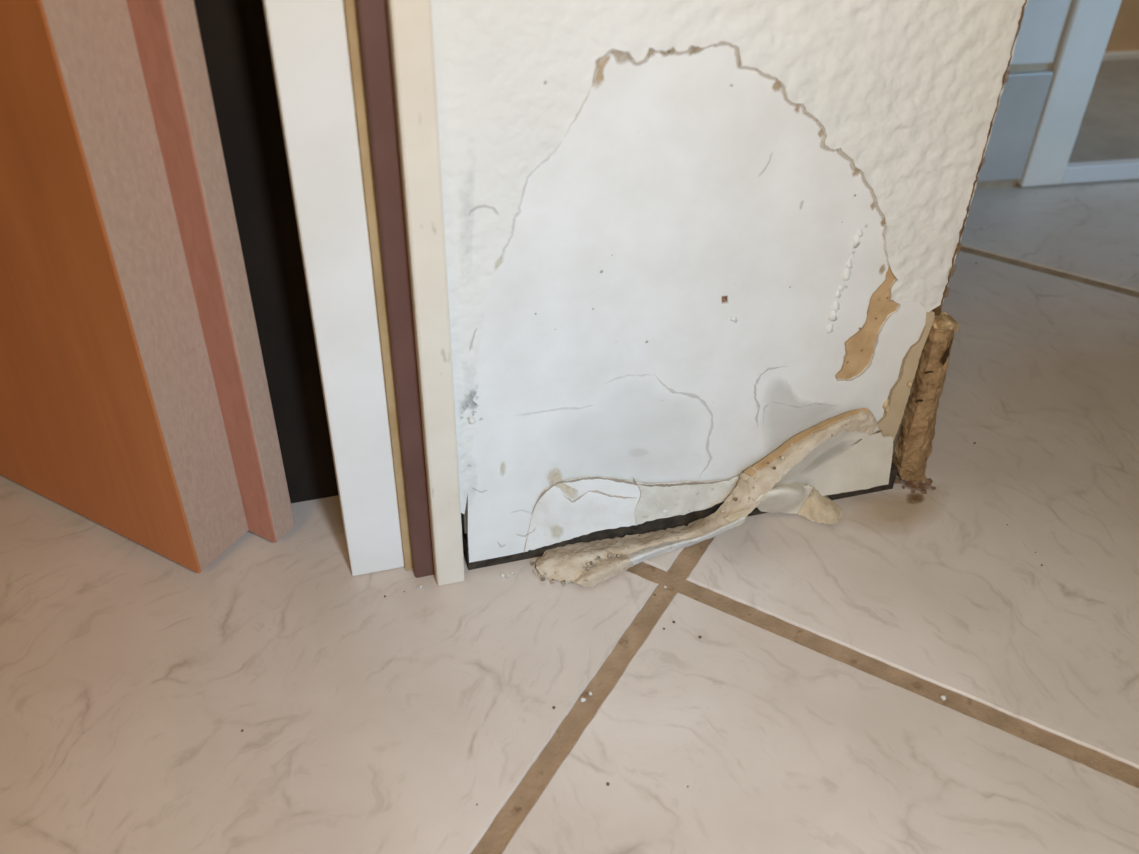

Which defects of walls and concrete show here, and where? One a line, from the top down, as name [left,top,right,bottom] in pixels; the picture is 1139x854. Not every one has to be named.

peeling [467,0,1027,587]